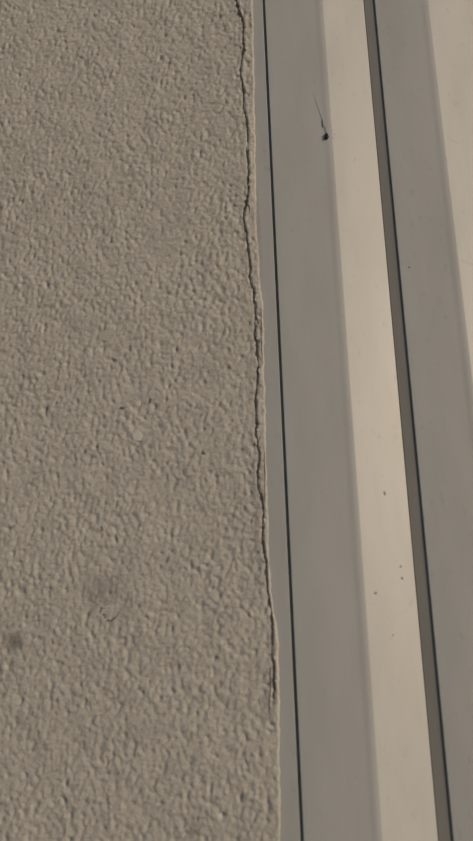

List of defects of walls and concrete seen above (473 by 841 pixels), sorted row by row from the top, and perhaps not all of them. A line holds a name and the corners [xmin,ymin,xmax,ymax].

crack [235,0,277,720]